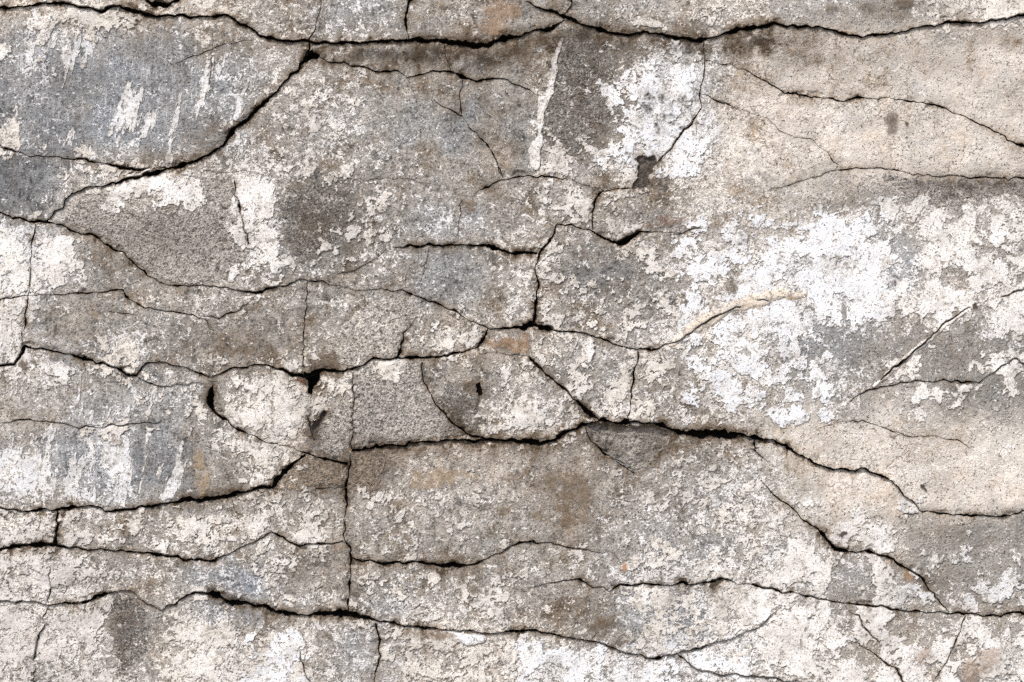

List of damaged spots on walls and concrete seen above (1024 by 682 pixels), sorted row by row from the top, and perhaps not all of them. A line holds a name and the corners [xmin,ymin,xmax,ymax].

crack [0,0,1024,387]
crack [850,307,1023,402]
crack [0,351,1024,627]
crack [6,569,121,682]
crack [373,623,381,682]
crack [411,625,576,639]
crack [525,483,1024,682]